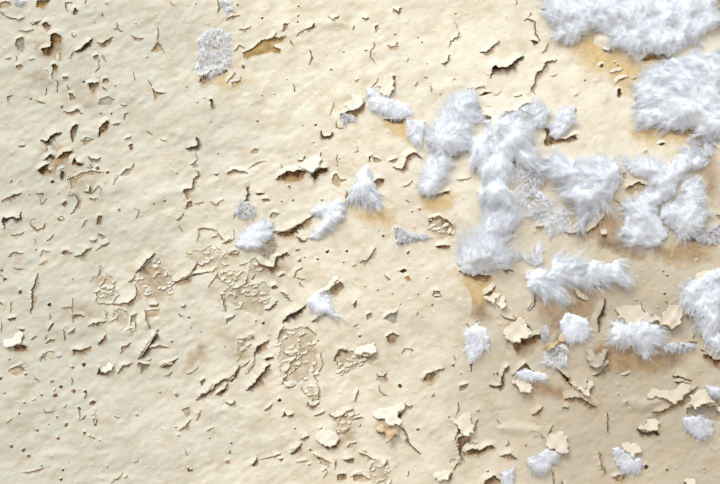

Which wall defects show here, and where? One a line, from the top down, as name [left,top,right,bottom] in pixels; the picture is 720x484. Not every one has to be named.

spalling [0,0,74,80]
spalling [239,19,315,69]
peeling [480,37,524,78]
spalling [33,75,128,221]
peeling [271,155,365,205]
leakage [634,128,705,143]
leakage [580,215,637,256]
peeling [0,271,39,380]
peeling [60,186,413,484]
peeling [489,291,566,394]
peeling [637,368,720,435]
peeling [432,407,527,484]